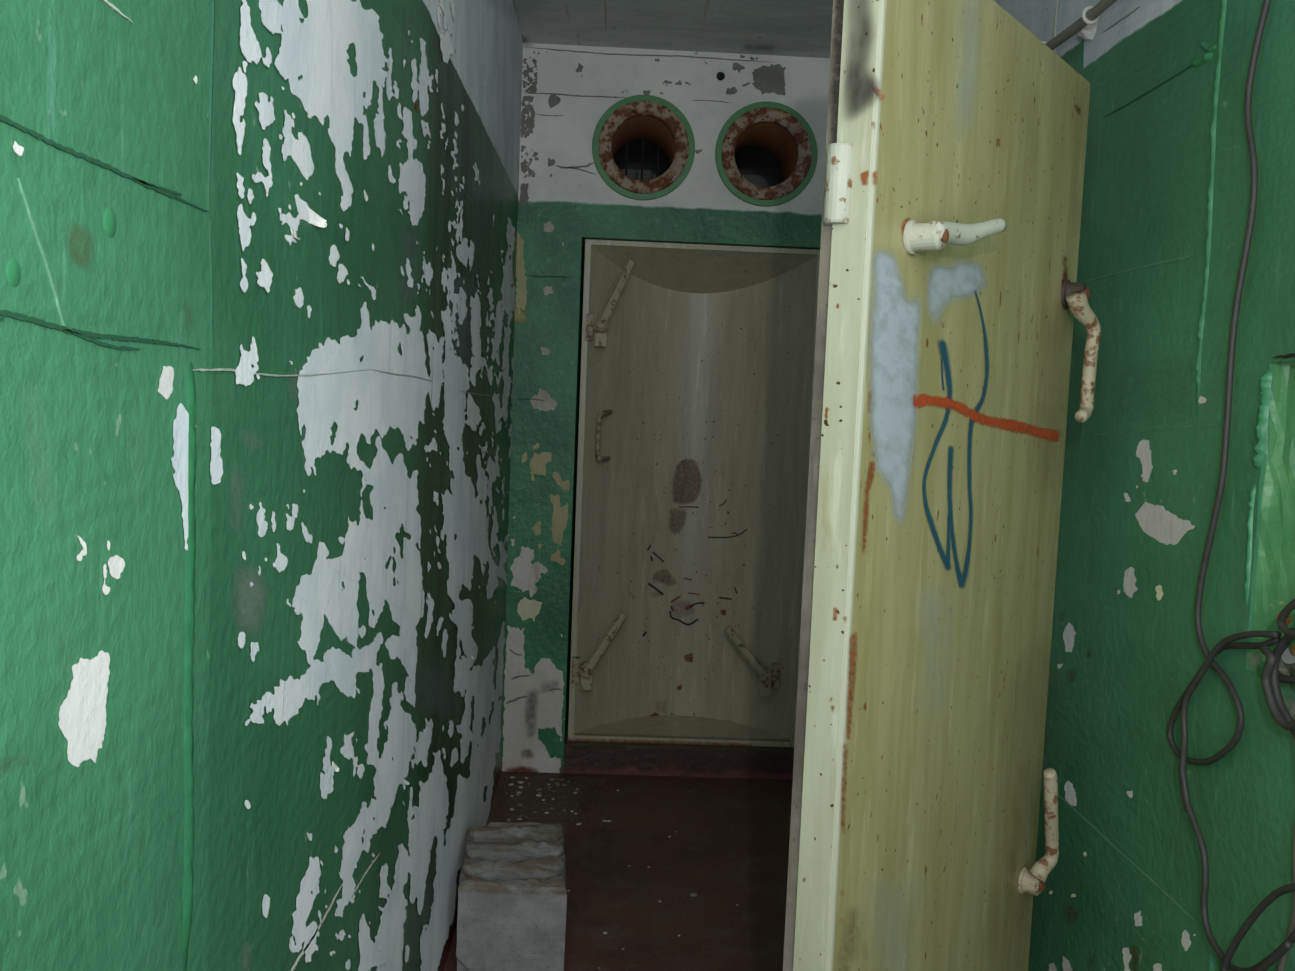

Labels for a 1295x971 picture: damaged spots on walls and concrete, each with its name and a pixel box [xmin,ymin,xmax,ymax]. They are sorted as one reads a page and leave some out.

peeling [726,55,786,95]
peeling [158,366,223,551]
peeling [232,0,570,971]
peeling [1124,440,1195,545]
peeling [58,650,110,767]
peeling [1048,956,1073,971]